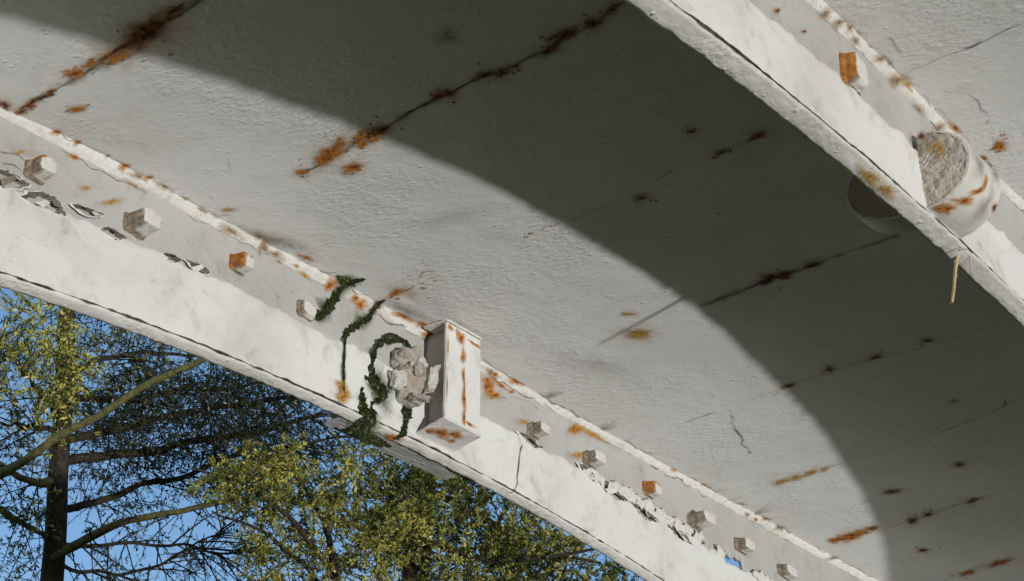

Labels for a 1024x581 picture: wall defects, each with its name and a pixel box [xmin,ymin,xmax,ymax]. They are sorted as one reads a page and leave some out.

corrosion [0,5,183,114]
corrosion [539,4,617,59]
spalling [0,169,129,241]
corrosion [120,163,168,189]
corrosion [317,116,387,174]
corrosion [862,169,895,198]
corrosion [933,134,1008,214]
corrosion [427,324,481,443]
corrosion [483,369,525,398]
crack [0,271,665,581]
peeling [576,462,705,546]
corrosion [829,522,887,543]